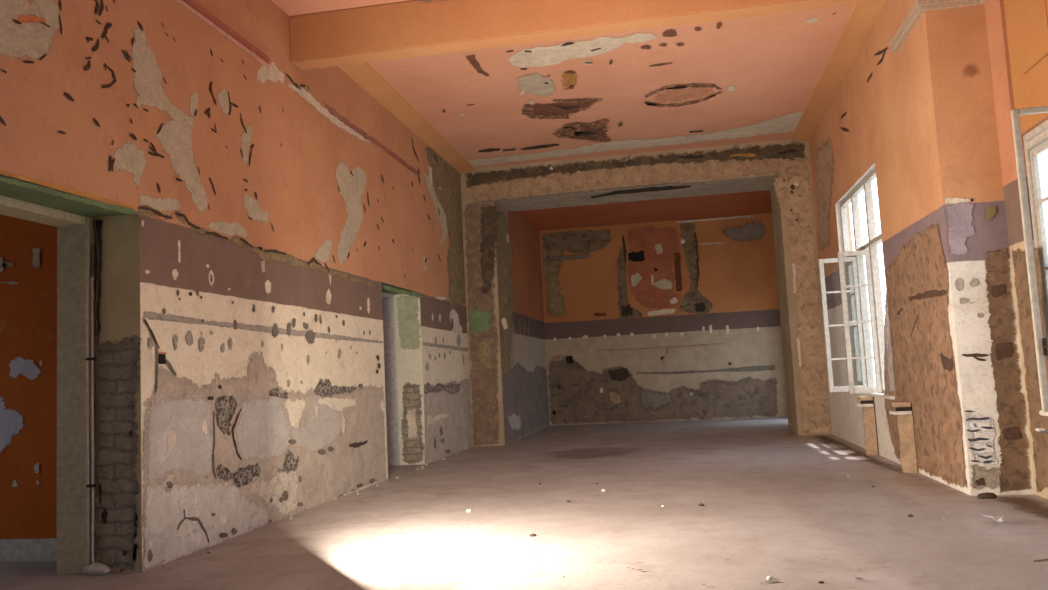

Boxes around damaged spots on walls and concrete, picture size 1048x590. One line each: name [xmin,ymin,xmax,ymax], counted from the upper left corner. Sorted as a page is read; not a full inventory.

peeling [0,0,63,63]
peeling [84,0,115,71]
peeling [507,33,658,104]
peeling [0,21,274,237]
peeling [315,161,380,285]
spalling [401,139,834,464]
peeling [9,357,42,380]
spalling [173,331,213,352]
spalling [884,224,1048,493]
crack [213,409,242,479]
spalling [90,335,386,572]
crack [177,509,209,543]